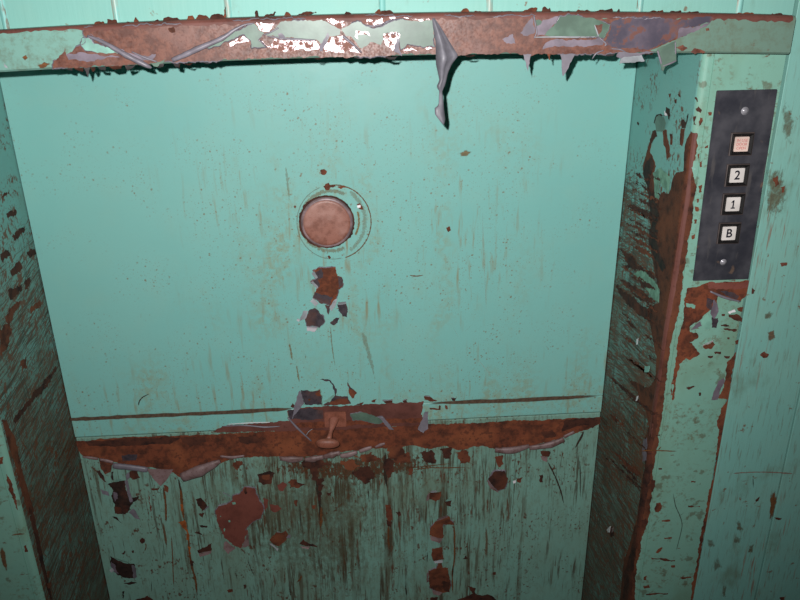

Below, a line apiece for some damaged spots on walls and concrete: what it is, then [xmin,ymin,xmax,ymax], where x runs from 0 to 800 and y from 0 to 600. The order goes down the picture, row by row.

peeling [0,6,793,125]
peeling [76,93,755,600]
corrosion [70,408,289,421]
corrosion [433,395,593,404]
corrosion [256,445,471,527]